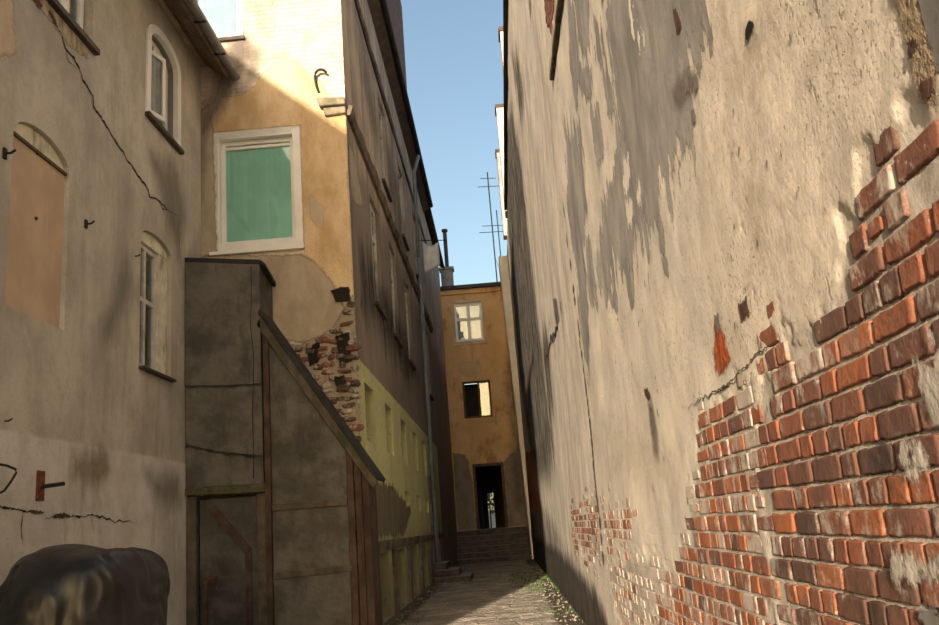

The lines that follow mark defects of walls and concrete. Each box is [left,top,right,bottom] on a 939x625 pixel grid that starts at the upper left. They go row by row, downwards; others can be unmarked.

crack [46,6,180,252]
peeling [201,59,364,442]
flaking render [544,0,554,36]
crack [686,339,777,408]
flaking render [563,0,939,625]
crack [0,505,135,543]